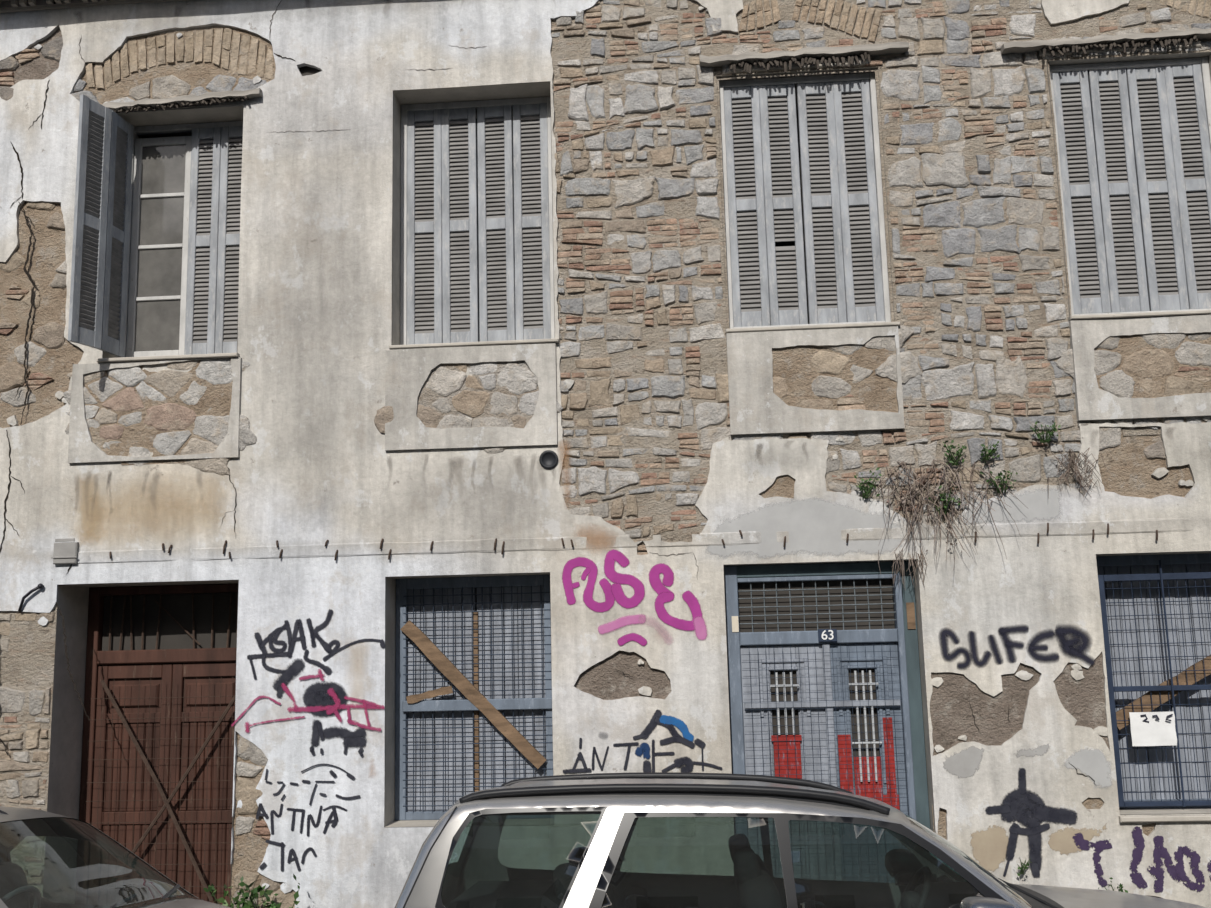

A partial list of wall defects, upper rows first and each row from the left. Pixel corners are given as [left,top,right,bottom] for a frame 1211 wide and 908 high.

flaking render [0,28,63,101]
flaking render [71,25,276,104]
crack [0,81,49,552]
flaking render [0,202,257,476]
flaking render [374,406,394,434]
flaking render [417,361,539,429]
flaking render [482,446,510,454]
flaking render [551,0,1211,555]
flaking render [0,605,57,811]
flaking render [574,650,671,700]
flaking render [930,652,1109,778]
flaking render [231,732,296,908]